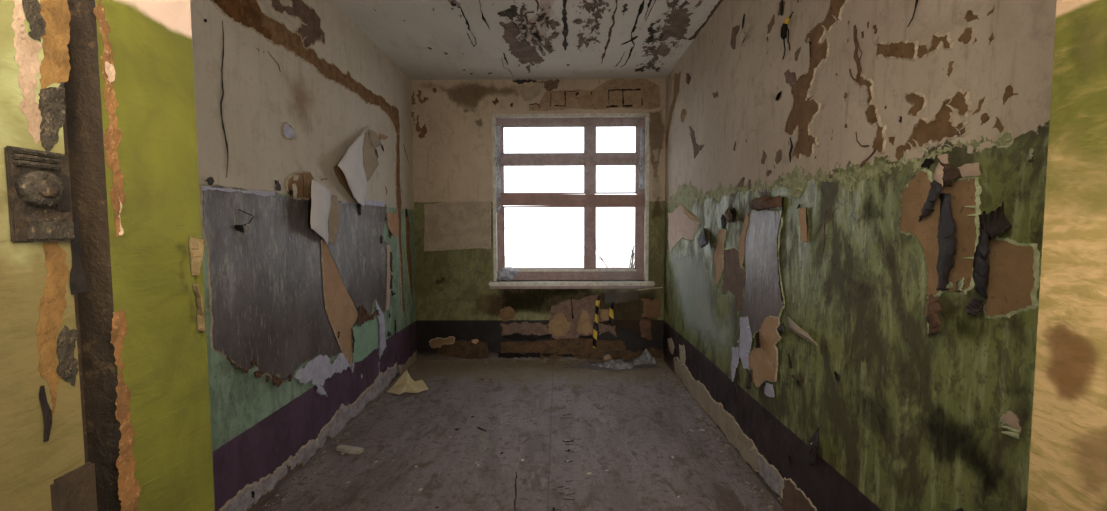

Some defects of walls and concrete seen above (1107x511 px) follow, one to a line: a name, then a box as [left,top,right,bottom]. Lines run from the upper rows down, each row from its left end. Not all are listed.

crack [220,21,229,178]
peeling [497,5,596,65]
spalling [529,0,704,148]
peeling [665,0,1040,389]
peeling [219,194,417,511]
spalling [550,295,609,340]
spalling [538,338,817,511]
leakage [928,408,995,491]